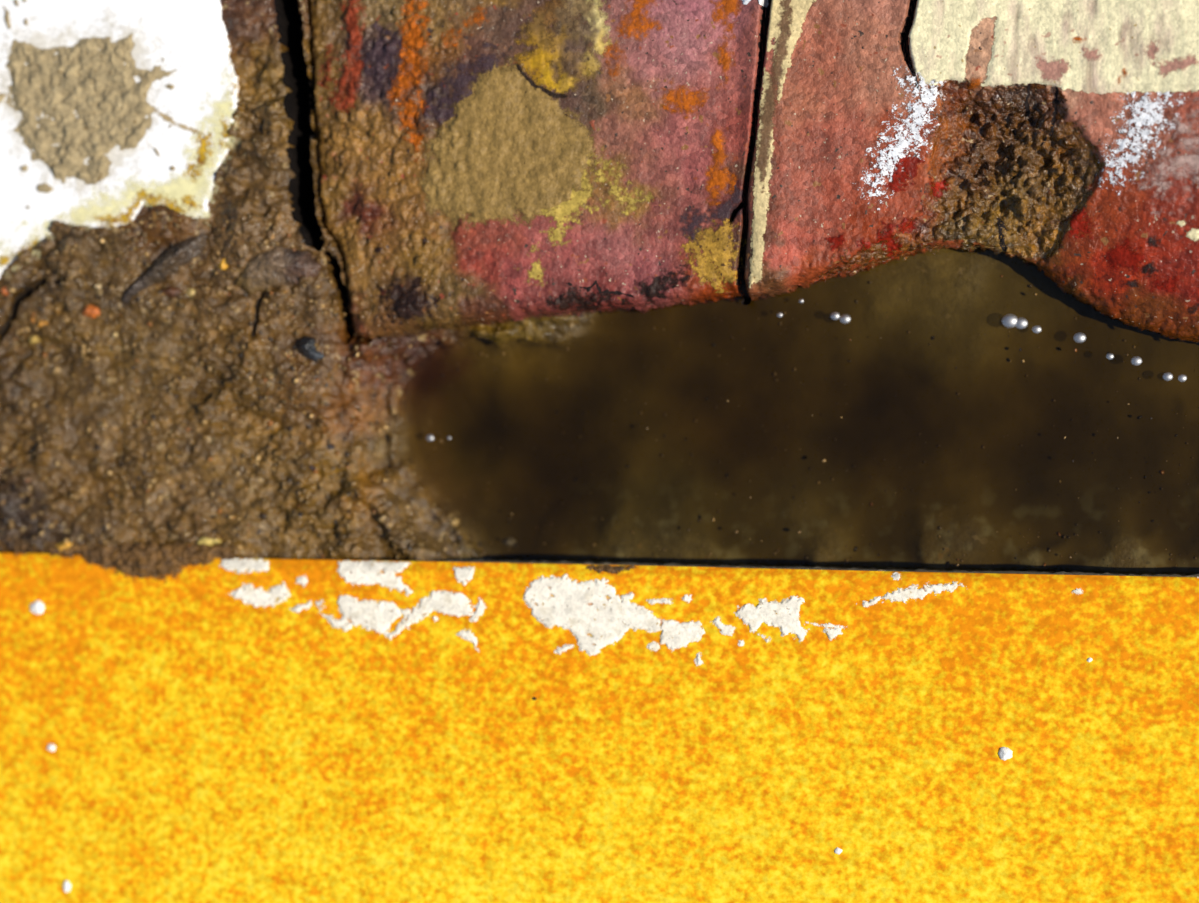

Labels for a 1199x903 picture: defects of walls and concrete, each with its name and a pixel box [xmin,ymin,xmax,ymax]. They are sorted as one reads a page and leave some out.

crack [900,0,919,90]
peeling [1147,42,1199,77]
crack [275,0,354,336]
crack [731,0,772,305]
damp [860,66,948,210]
spalling [819,78,1106,282]
damp [379,275,439,334]
damp [541,264,691,317]
damp [1126,263,1158,287]
peeling [219,558,487,652]
peeling [523,574,844,666]
peeling [856,572,964,607]